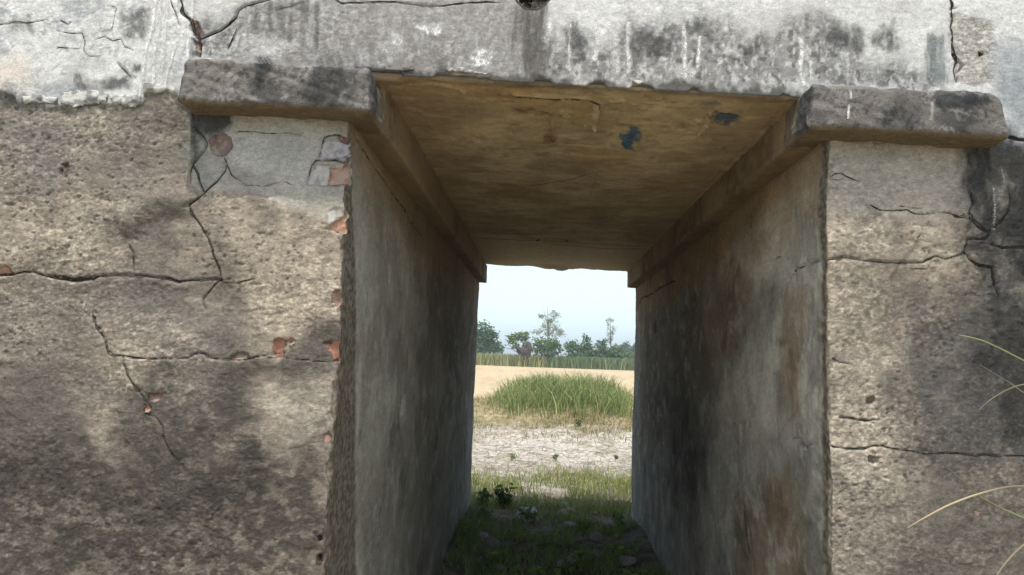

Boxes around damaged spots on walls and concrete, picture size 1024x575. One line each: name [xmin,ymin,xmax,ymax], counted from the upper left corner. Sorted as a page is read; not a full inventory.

crack [171,0,301,55]
crack [337,0,496,8]
efflorescence [592,22,631,74]
efflorescence [670,23,701,79]
efflorescence [798,37,814,86]
damp [927,33,945,82]
crack [950,0,962,79]
flaking render [307,135,352,187]
flaking render [326,207,349,235]
flaking render [272,337,295,361]
flaking render [324,339,340,364]
crack [681,186,1024,575]